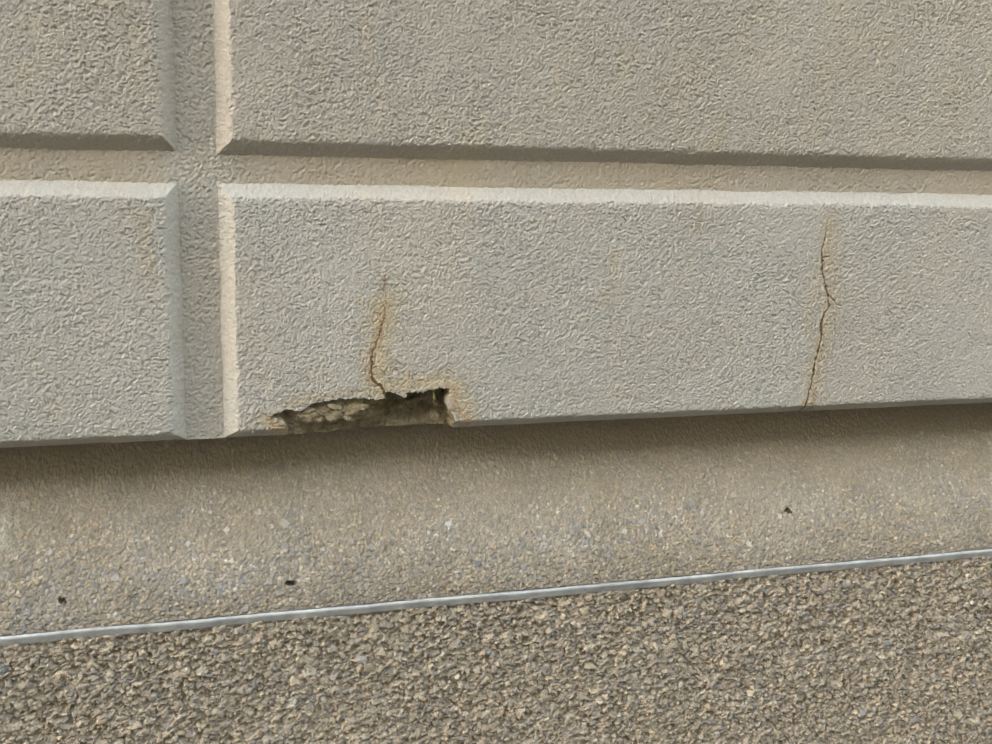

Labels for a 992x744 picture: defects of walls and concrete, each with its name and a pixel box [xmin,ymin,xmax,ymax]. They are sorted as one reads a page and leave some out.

crack [370,322,385,395]
crack [799,238,838,411]
spalling [269,388,455,434]